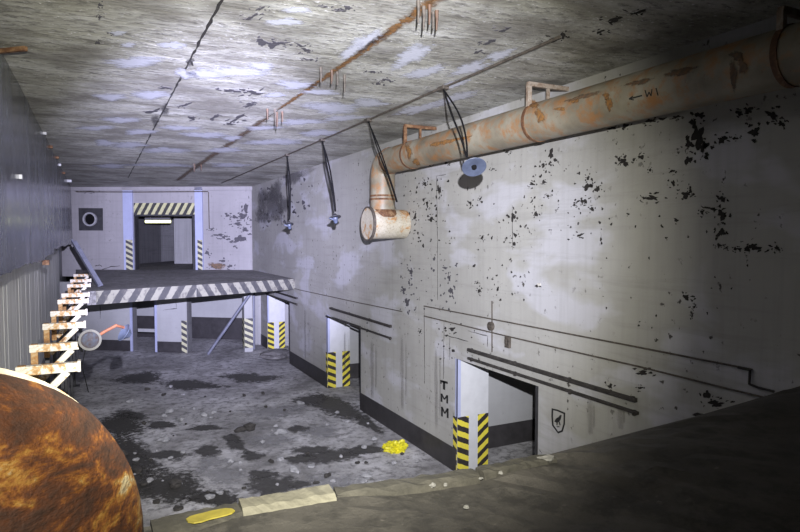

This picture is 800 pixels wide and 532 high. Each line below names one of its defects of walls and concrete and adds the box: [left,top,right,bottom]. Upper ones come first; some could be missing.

spalling [256,36,318,62]
corrosion [280,0,439,109]
crack [128,0,224,177]
peeling [643,103,789,165]
peeling [206,196,252,249]
leakage [257,172,302,222]
peeling [403,177,451,248]
peeling [498,207,532,248]
peeling [400,257,458,315]
leakage [112,409,176,429]
leakage [136,425,266,461]
leakage [244,470,311,496]